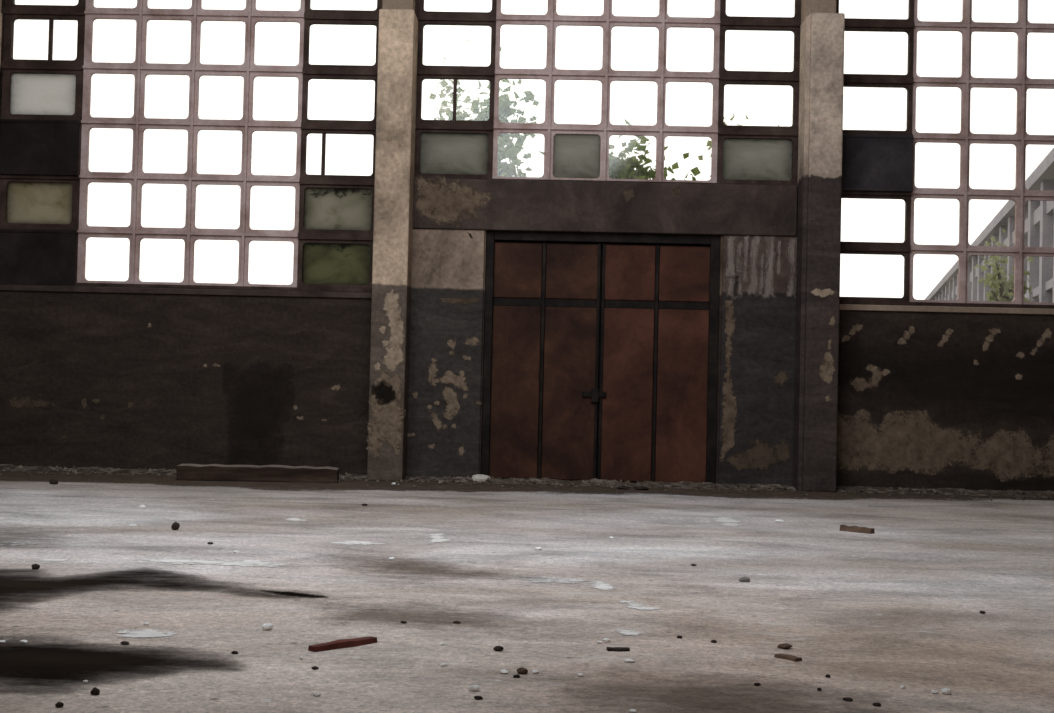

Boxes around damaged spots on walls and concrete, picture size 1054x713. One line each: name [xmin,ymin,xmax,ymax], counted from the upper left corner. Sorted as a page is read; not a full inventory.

leakage [726,235,797,299]
peeling [366,289,418,457]
peeling [427,335,481,429]
peeling [719,300,790,471]
peeling [819,324,863,402]
peeling [850,364,891,392]
peeling [897,326,915,344]
peeling [937,328,953,347]
peeling [973,328,1001,365]
peeling [1016,327,1052,359]
peeling [837,409,1054,482]